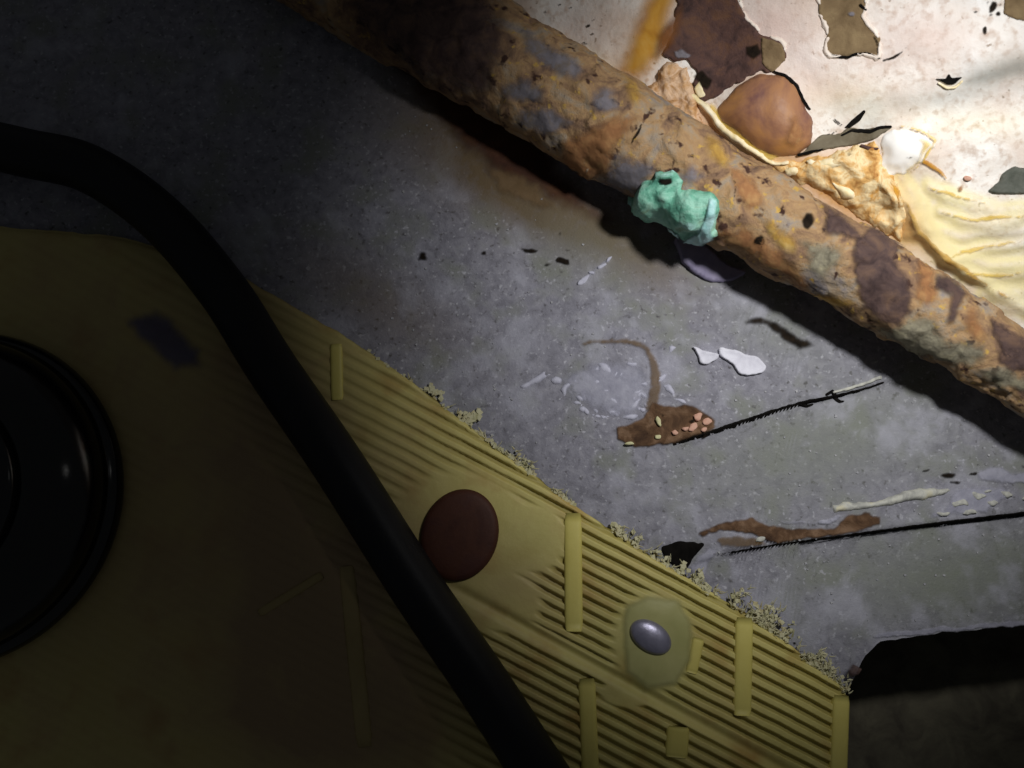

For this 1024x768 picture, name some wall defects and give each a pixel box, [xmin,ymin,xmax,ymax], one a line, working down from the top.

peeling [1004,0,1024,21]
rust [353,0,631,206]
peeling [663,0,892,166]
peeling [937,74,963,89]
rust [626,0,967,325]
peeling [988,166,1024,195]
rust [992,320,1024,371]
crack [673,376,884,445]
crack [723,512,1024,555]
spalling [874,621,1024,637]